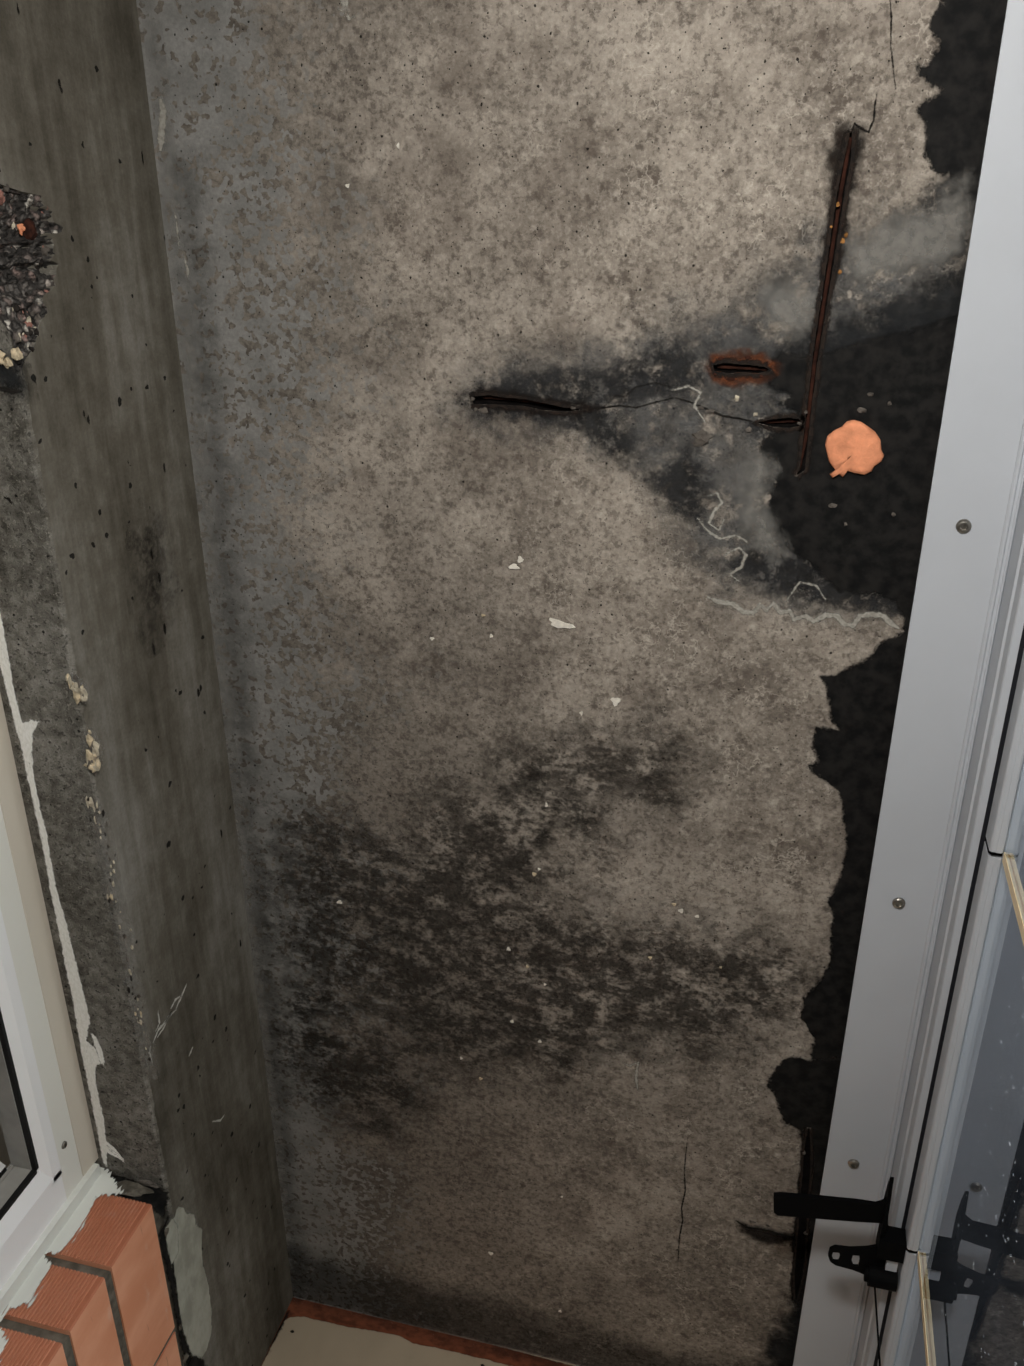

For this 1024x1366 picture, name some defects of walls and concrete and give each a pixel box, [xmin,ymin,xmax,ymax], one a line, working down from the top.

damp [157,99,167,151]
damp [260,0,1008,1195]
damp [764,1218,816,1366]